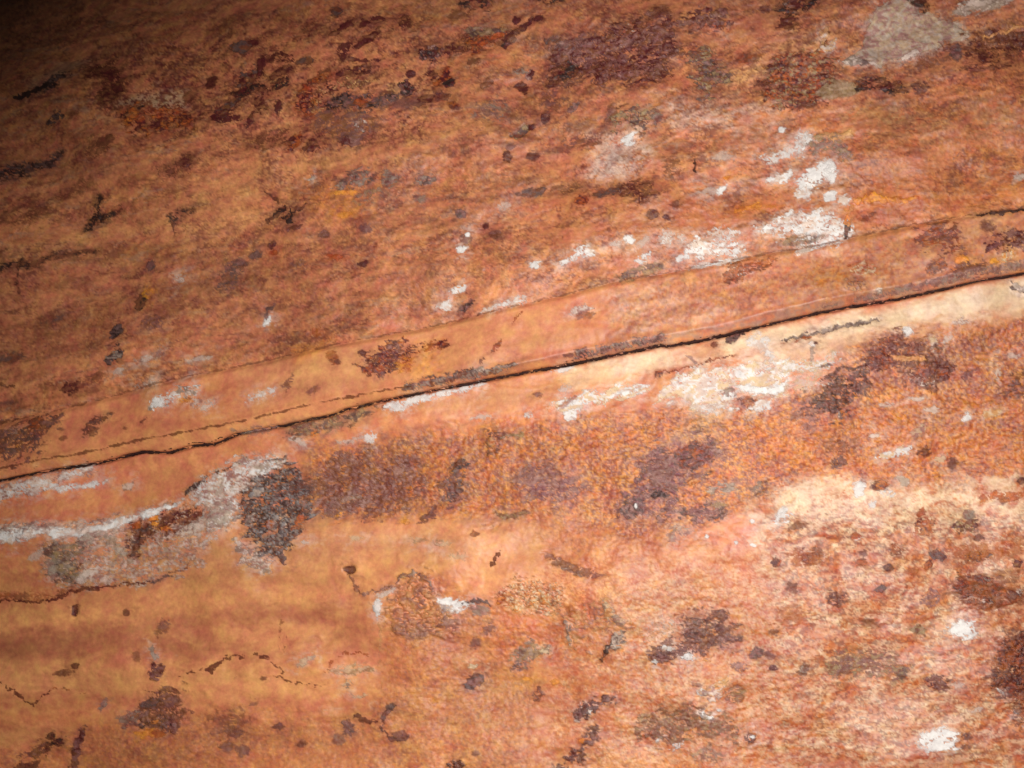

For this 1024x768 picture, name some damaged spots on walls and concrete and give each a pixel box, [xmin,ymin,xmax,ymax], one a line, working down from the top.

rust [210,7,544,152]
rust [503,5,839,163]
rust [844,208,1024,302]
rust [326,336,517,394]
crack [0,273,1024,496]
rust [801,326,973,424]
water stain [45,479,108,492]
rust [125,503,203,557]
rust [614,427,736,541]
rust [908,477,1024,611]
rust [644,606,778,672]
rust [556,695,617,768]